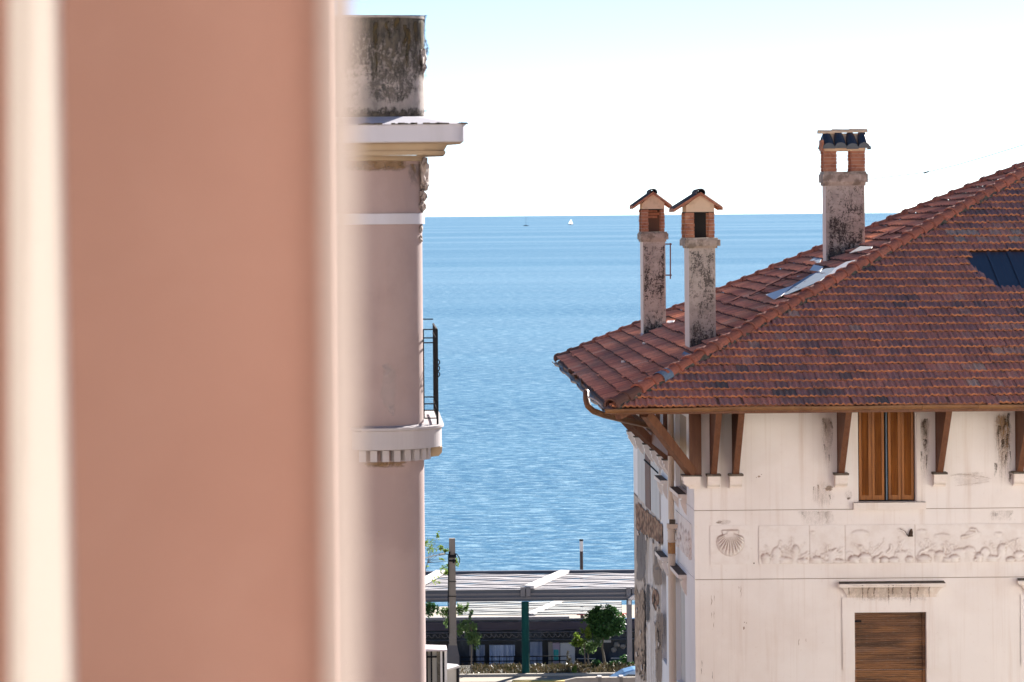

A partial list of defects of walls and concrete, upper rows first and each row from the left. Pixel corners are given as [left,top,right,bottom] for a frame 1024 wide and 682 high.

damp [356,15,429,117]
damp [828,186,864,261]
damp [644,246,665,334]
damp [690,251,714,347]
spalling [635,503,663,546]